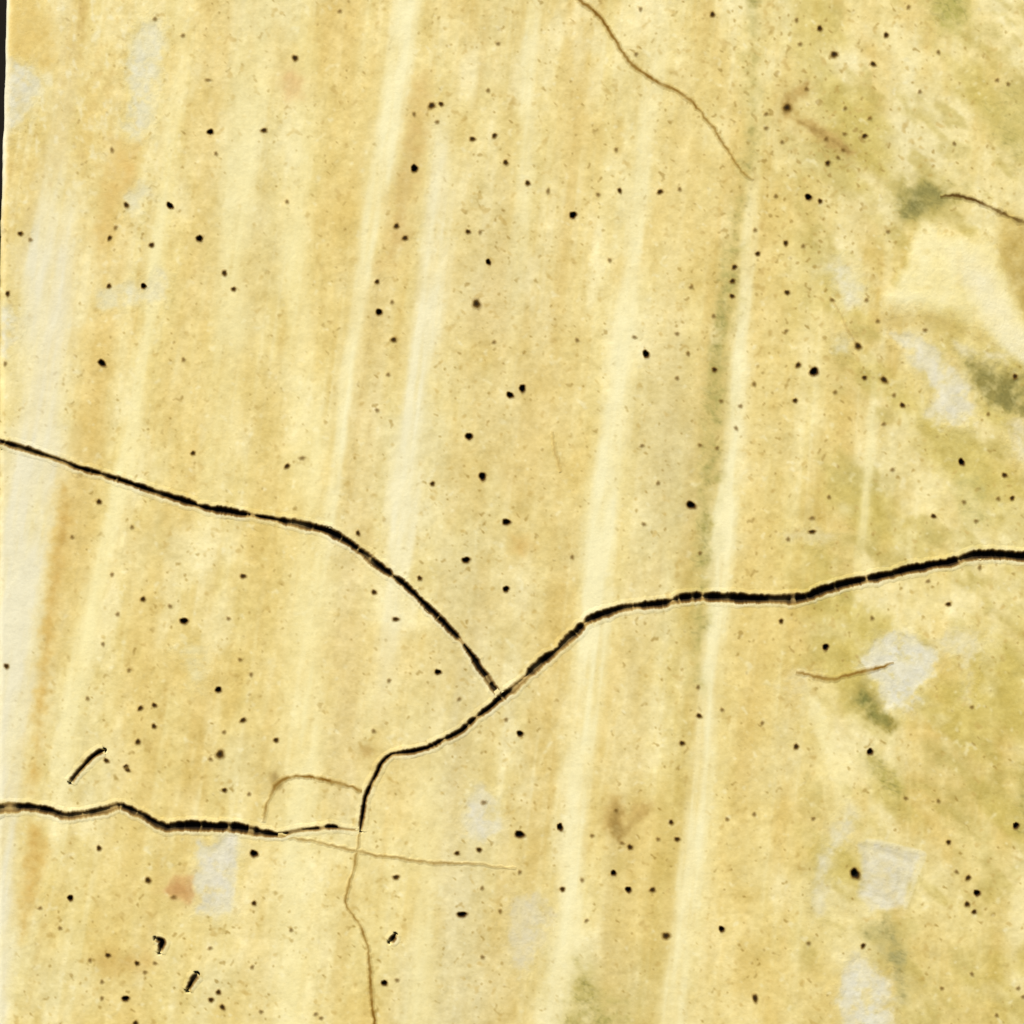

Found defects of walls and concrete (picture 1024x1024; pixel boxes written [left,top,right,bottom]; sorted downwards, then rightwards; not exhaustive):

crack [575,0,754,181]
crack [940,191,1024,226]
crack [0,435,1024,1024]